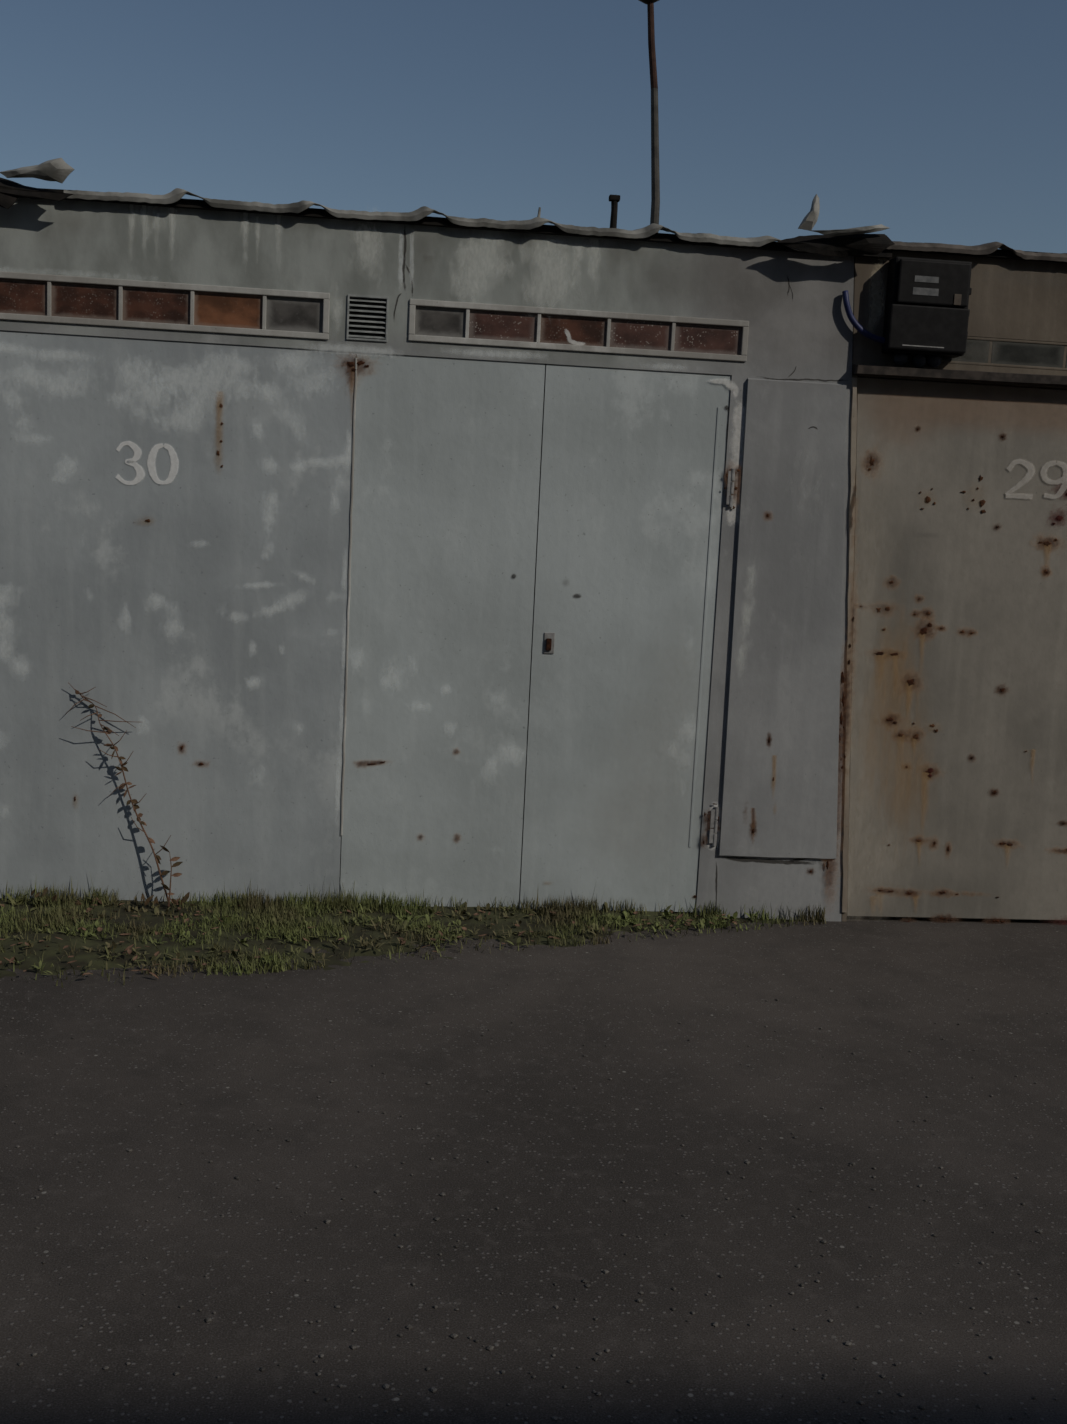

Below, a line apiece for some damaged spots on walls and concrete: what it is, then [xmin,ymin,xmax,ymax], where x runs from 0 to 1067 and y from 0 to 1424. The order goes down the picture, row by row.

corrosion [342,358,369,381]
corrosion [1038,488,1067,547]
corrosion [914,597,976,635]
corrosion [837,604,891,835]
corrosion [885,715,938,741]